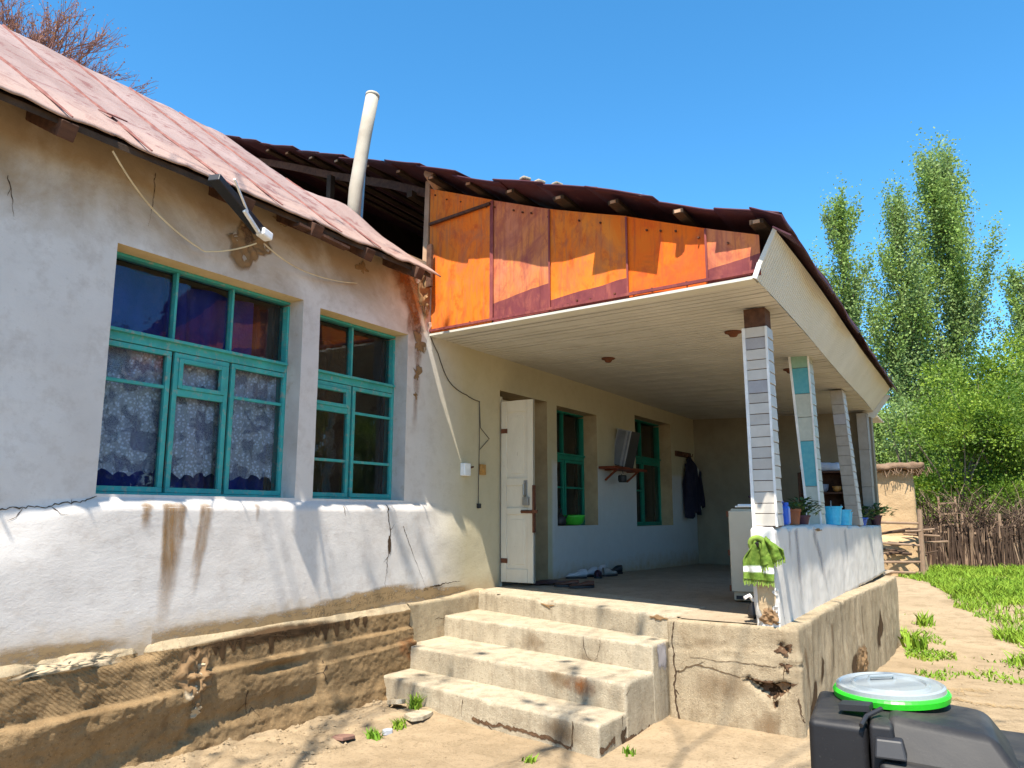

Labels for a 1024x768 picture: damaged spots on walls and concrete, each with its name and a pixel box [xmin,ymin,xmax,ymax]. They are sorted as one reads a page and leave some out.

corrosion [397,271,421,333]
crack [0,496,96,520]
damp [163,505,185,575]
crack [384,506,459,591]
peeling [757,580,780,625]
spalling [0,640,119,681]
peeling [151,585,465,719]
crack [671,622,785,719]
spalling [741,642,797,709]
spalling [852,611,883,673]
spalling [471,717,571,750]